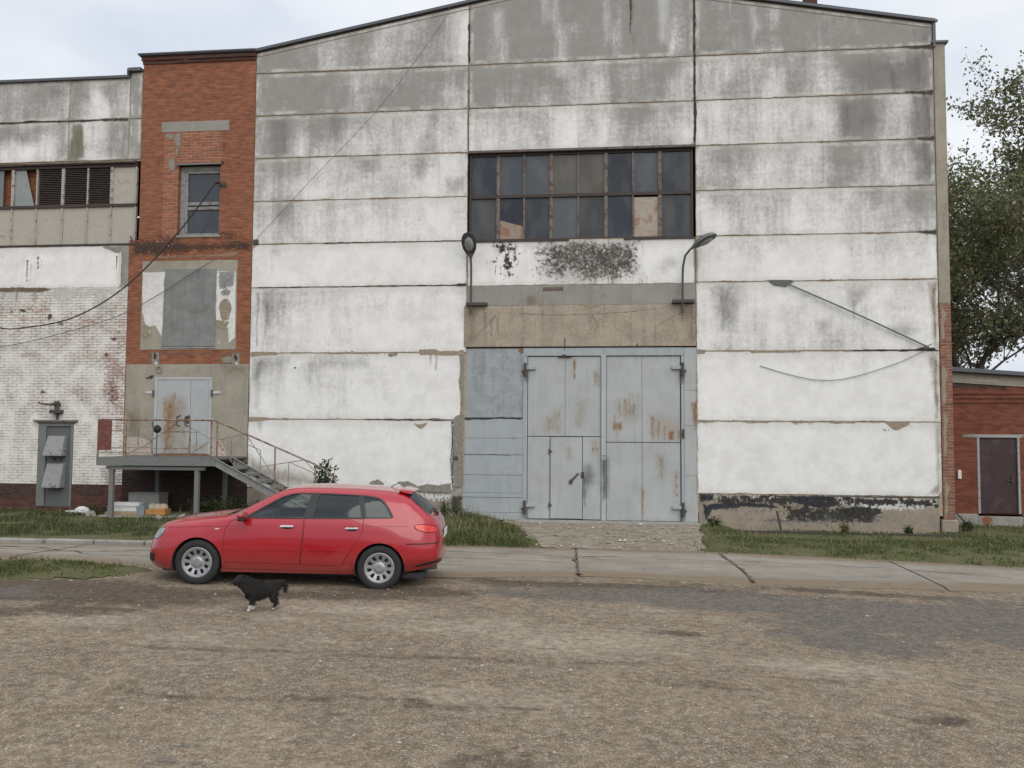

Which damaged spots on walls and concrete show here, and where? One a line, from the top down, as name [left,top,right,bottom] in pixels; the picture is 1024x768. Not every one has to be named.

water stain [486,242,521,278]
peeling [216,299,233,329]
peeling [822,495,940,516]